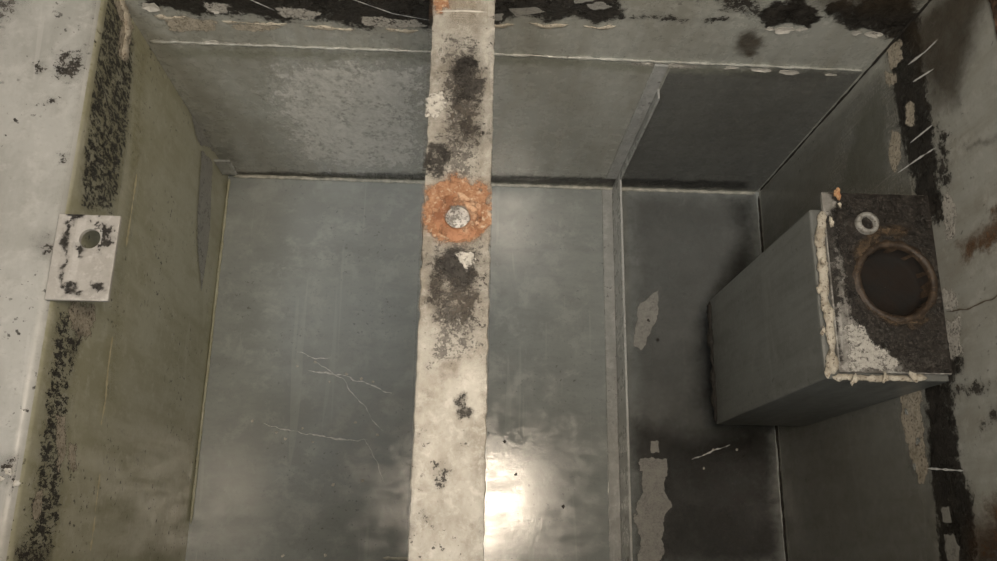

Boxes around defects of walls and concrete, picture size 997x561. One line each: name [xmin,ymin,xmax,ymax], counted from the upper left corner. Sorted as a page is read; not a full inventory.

corrosion [433,0,449,14]
leakage [705,0,761,24]
leakage [251,48,491,179]
corrosion [422,173,492,242]
leakage [424,245,490,338]
peeling [633,290,659,350]
crack [947,295,997,312]
peeling [843,323,899,386]
leakage [953,379,990,398]
peeling [900,371,929,484]
peeling [633,440,672,561]